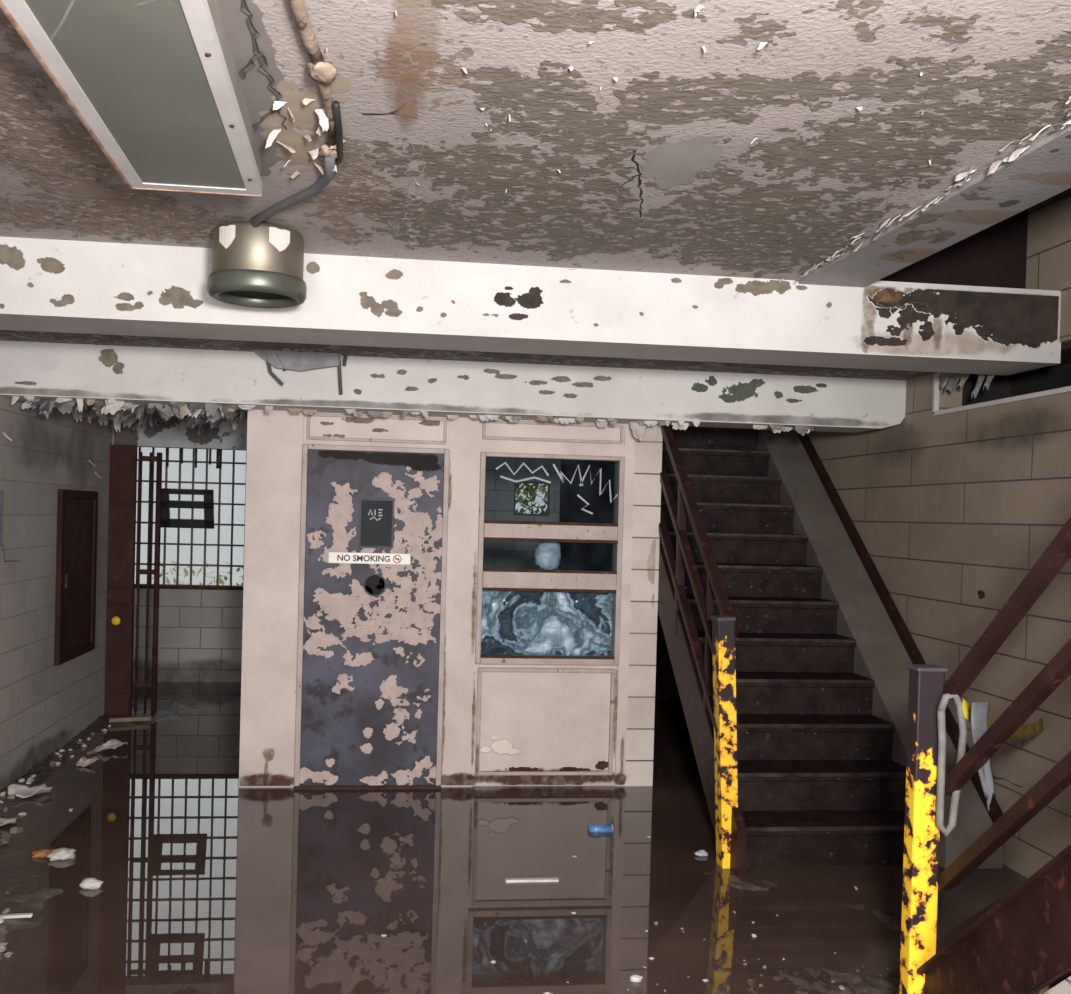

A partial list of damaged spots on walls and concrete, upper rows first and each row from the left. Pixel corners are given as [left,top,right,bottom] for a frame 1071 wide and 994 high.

crack [239,0,287,132]
peeling [0,8,243,246]
peeling [217,0,1071,297]
crack [621,151,644,236]
peeling [482,286,544,321]
peeling [862,286,1060,350]
peeling [10,381,273,446]
peeling [0,330,437,391]
peeling [448,350,864,403]
peeling [303,450,443,695]
peeling [359,675,431,754]
peeling [359,755,436,785]